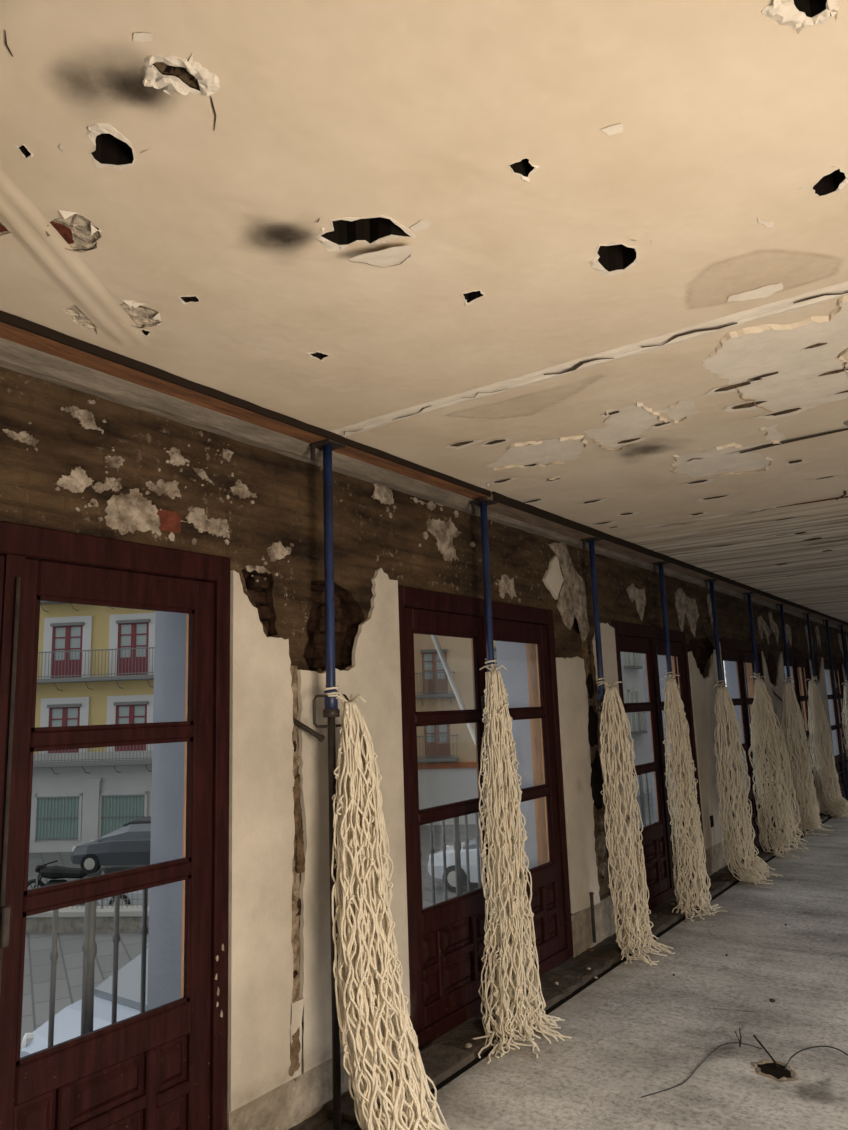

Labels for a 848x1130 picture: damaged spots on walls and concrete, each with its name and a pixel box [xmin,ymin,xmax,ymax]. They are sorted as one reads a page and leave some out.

spalling [46,210,102,253]
peeling [446,295,848,488]
peeling [74,497,103,522]
flaking render [157,509,197,545]
peeling [145,443,234,495]
peeling [671,443,806,516]
spalling [241,556,278,637]
spalling [303,580,365,671]